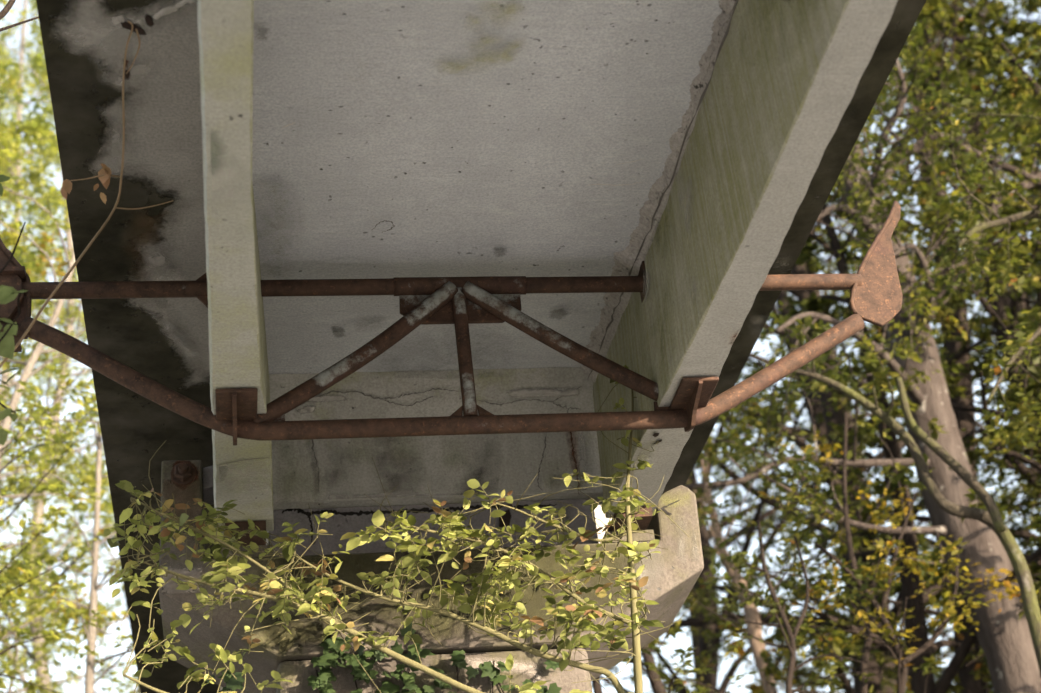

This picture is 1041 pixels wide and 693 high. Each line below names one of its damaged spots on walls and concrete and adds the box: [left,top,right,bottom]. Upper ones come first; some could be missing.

leakage [36,0,197,282]
leakage [81,298,211,408]
crack [282,0,739,542]
leakage [92,369,220,693]